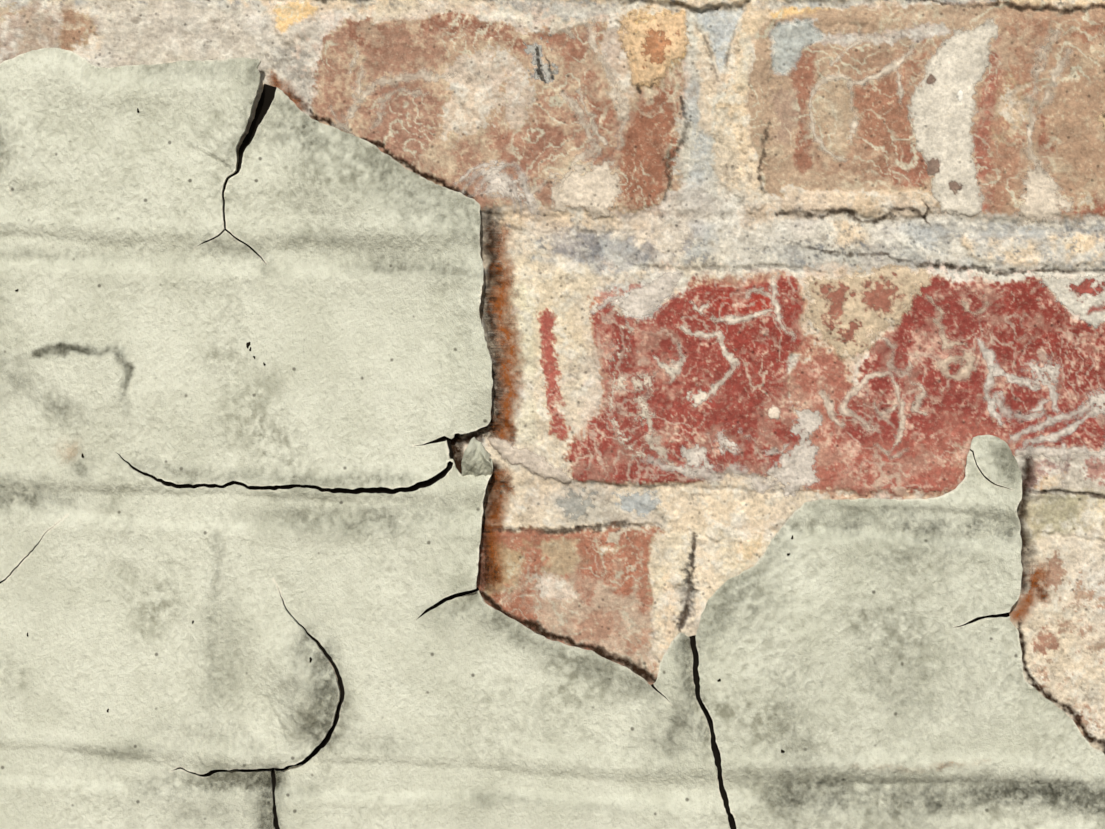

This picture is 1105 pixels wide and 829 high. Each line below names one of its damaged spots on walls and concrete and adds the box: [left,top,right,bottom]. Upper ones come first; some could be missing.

crack [198,84,277,262]
spalling [524,35,558,83]
spalling [618,10,689,87]
peeling [908,19,998,217]
spalling [803,264,931,357]
crack [0,524,56,583]
crack [171,591,345,829]
crack [115,436,453,494]
peeling [0,48,731,829]
crack [679,542,736,829]
peeling [768,407,780,419]
peeling [695,435,1105,829]